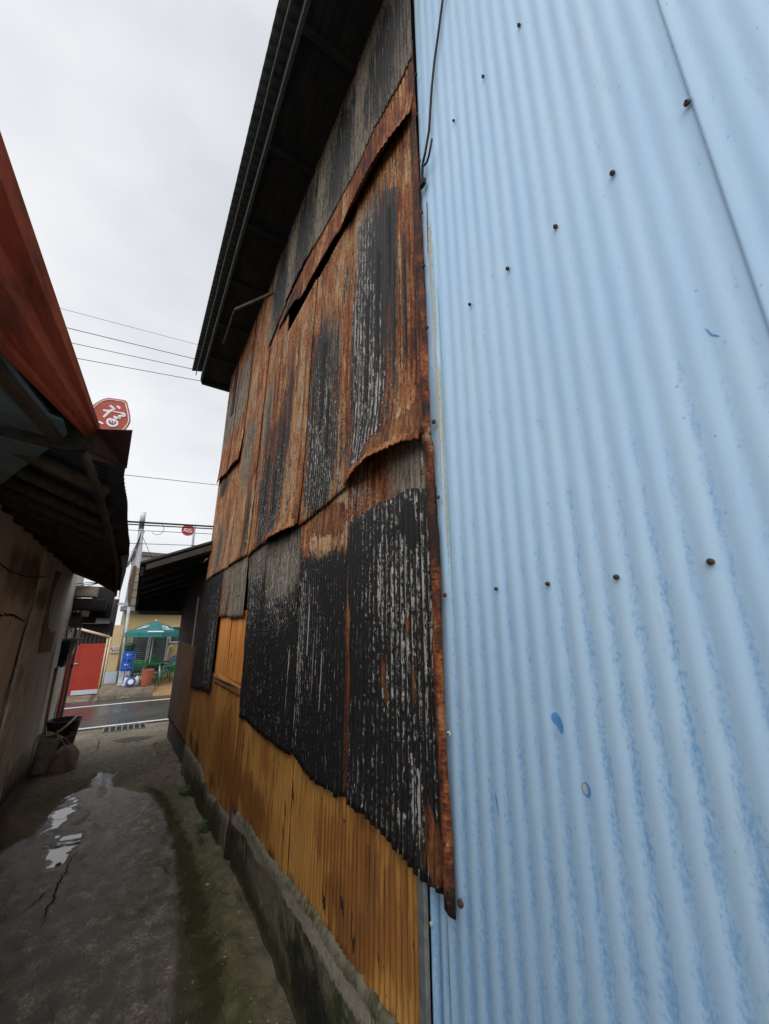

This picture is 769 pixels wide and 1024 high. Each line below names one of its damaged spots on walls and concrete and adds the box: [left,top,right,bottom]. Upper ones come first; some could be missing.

rust [426,202,449,555]
rust [310,501,348,540]
peeling [378,543,406,629]
peeling [284,599,322,720]
peeling [410,753,421,850]